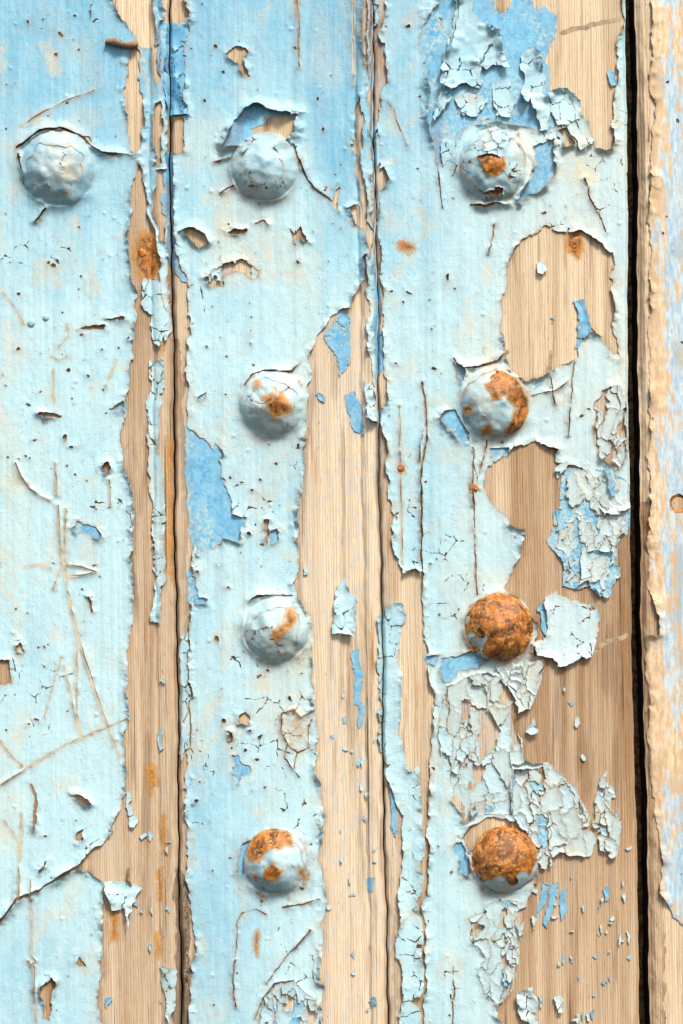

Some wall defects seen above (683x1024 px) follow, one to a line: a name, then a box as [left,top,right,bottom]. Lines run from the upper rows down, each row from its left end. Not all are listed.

peeling [223,102,298,146]
corrosion [481,154,506,176]
corrosion [133,232,160,284]
corrosion [254,380,293,419]
corrosion [481,370,529,438]
peeling [72,0,251,1024]
peeling [258,0,683,1024]
corrosion [270,608,297,641]
corrosion [465,592,533,662]
corrosion [247,829,295,881]
corrosion [472,826,538,881]